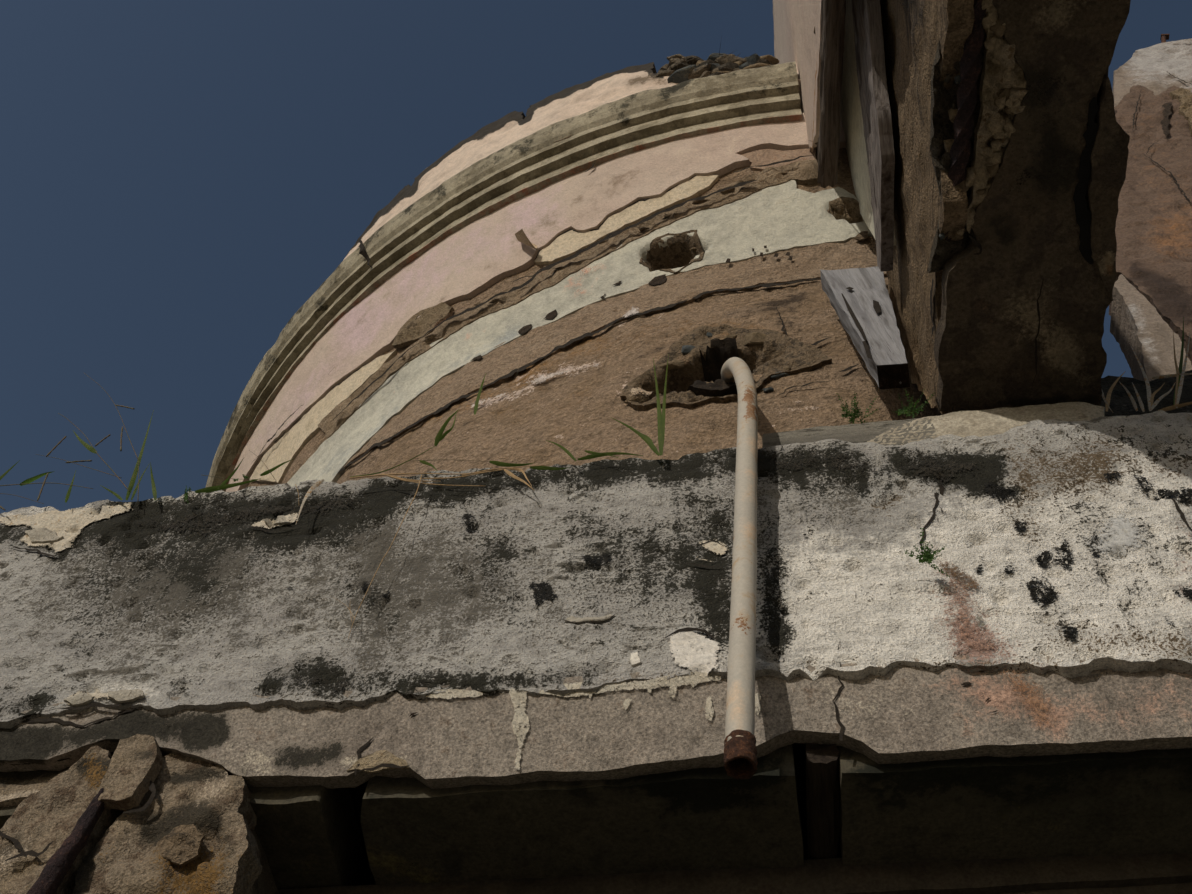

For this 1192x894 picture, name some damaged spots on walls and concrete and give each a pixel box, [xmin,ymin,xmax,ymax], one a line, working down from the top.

spalling [248,140,832,484]
crack [919,480,944,552]
leakage [1102,470,1192,507]
peeling [665,627,723,675]
corrosion [933,561,995,650]
leakage [1026,533,1075,606]
leakage [1055,624,1079,643]
leakage [415,682,485,699]
leakage [509,671,721,770]
crack [833,642,848,741]
peeling [96,734,163,811]
spalling [158,824,206,867]